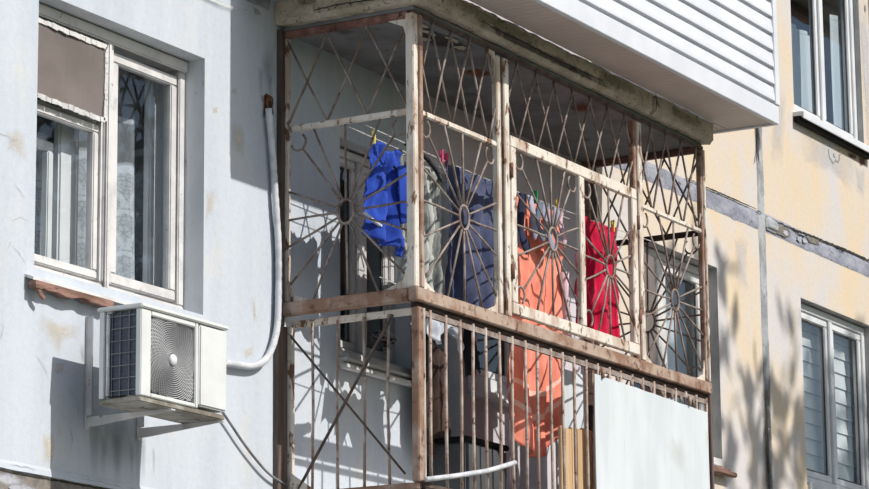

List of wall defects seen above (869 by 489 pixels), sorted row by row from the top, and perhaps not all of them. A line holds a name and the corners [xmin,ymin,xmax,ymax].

peeling [0,468,109,489]